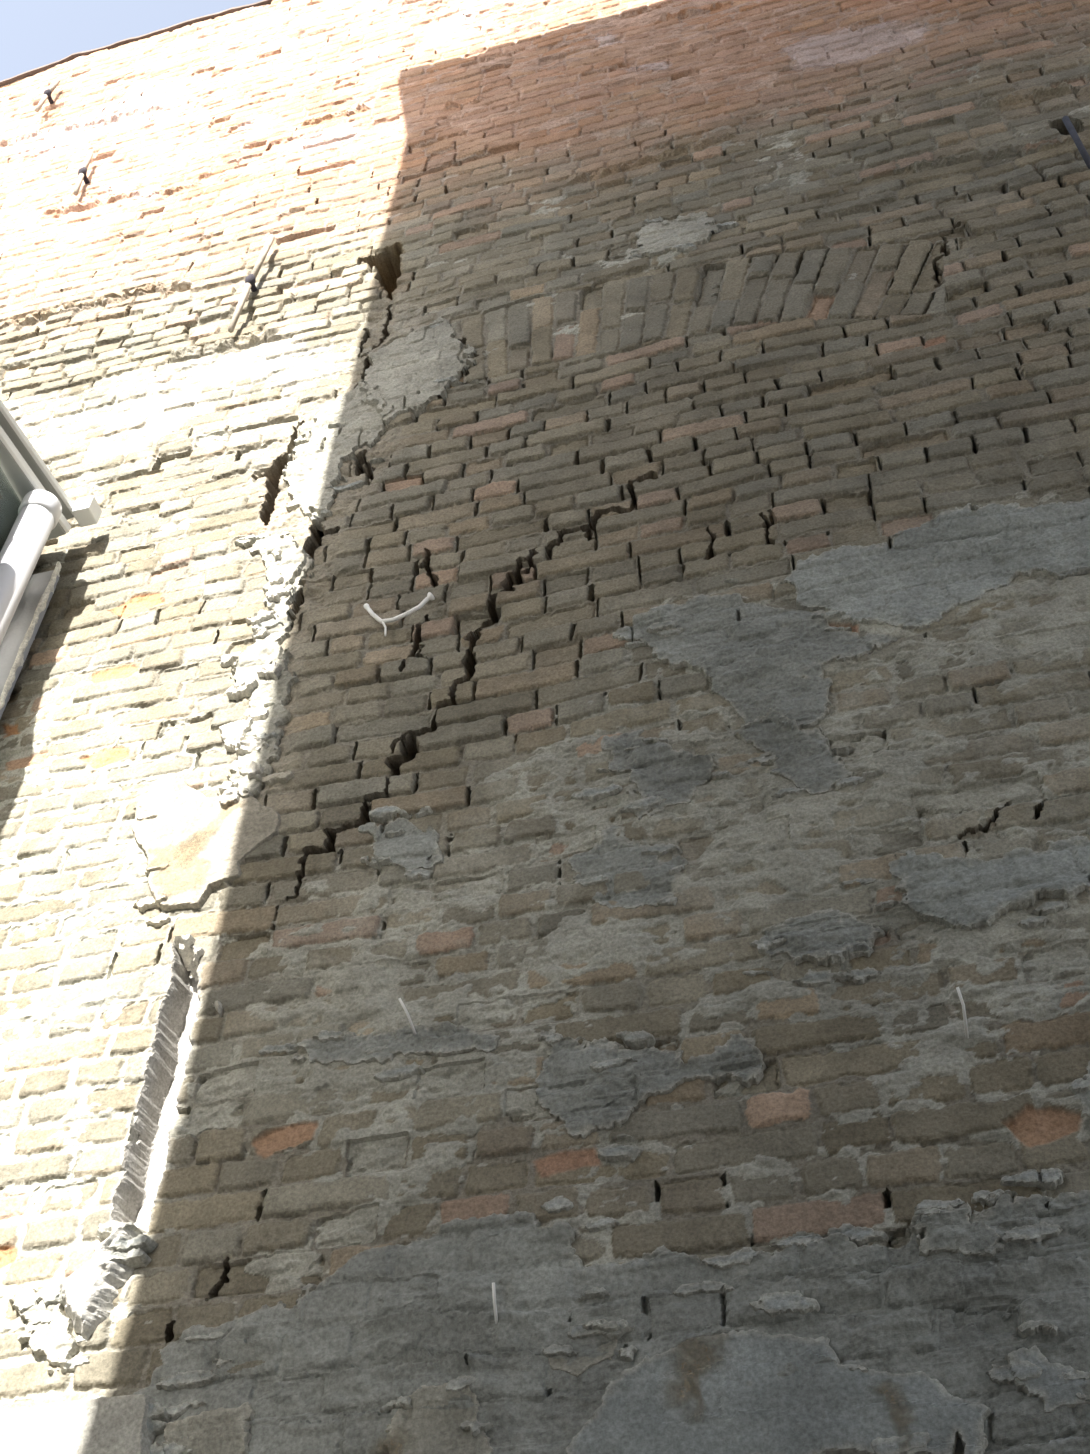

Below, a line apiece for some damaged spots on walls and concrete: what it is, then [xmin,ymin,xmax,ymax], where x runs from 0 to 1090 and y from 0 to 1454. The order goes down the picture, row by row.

crack [353,304,393,389]
crack [352,449,376,485]
crack [250,420,341,627]
crack [285,470,659,902]
peeling [1018,901,1068,929]
spalling [1000,1074,1090,1149]
peeling [541,1195,574,1214]
peeling [673,1223,889,1298]
peeling [914,1168,1065,1216]
peeling [984,1221,1063,1257]
peeling [543,1290,993,1454]
peeling [986,1320,1090,1413]